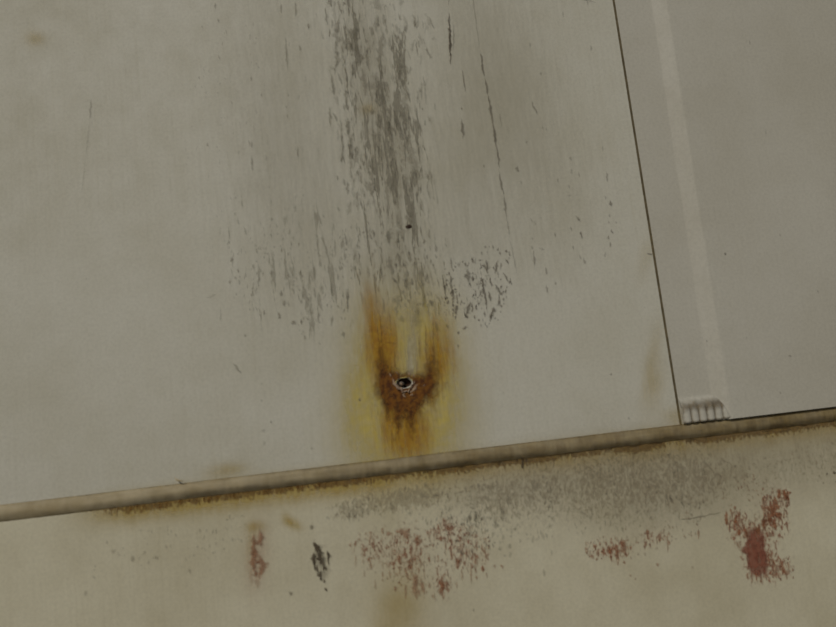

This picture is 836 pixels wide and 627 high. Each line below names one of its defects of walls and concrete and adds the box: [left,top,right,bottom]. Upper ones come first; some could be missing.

corrosion [347,303,455,461]
corrosion [0,421,836,522]